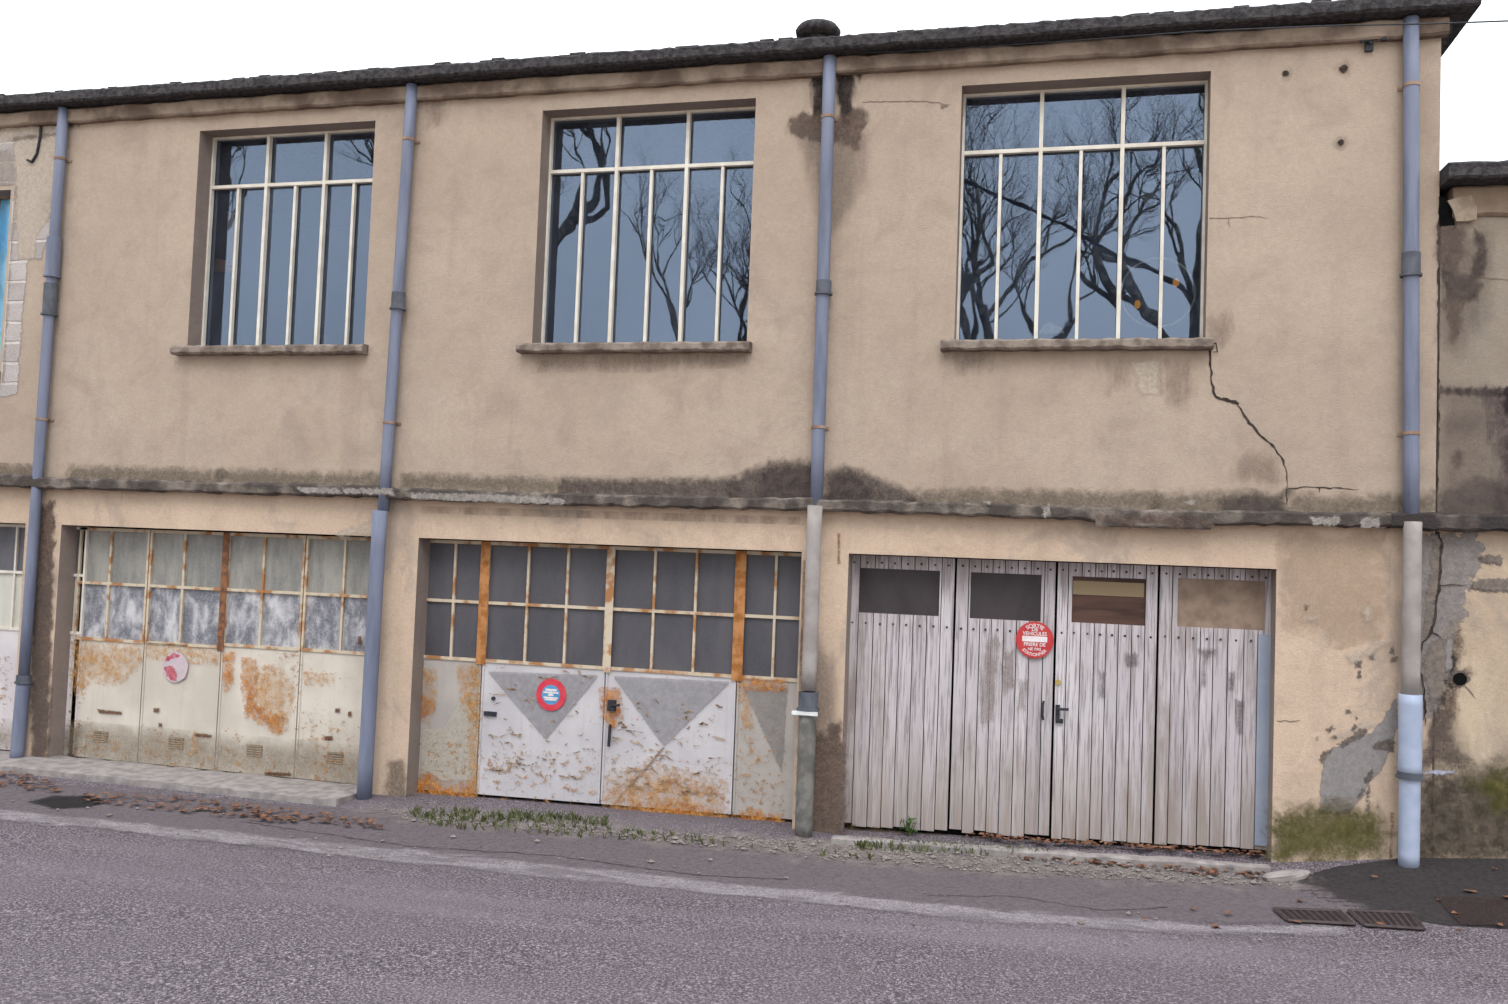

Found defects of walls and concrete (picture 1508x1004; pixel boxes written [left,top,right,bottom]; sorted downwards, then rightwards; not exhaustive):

water stain [789,74,866,150]
water stain [1437,226,1487,343]
water stain [71,468,380,485]
water stain [403,462,1434,513]
crack [1209,343,1358,505]
crack [1420,209,1463,725]
water stain [1483,386,1508,496]
spalling [1471,554,1508,593]
spalling [1445,638,1471,688]
flaking render [1316,699,1398,815]
water stain [1420,634,1508,858]